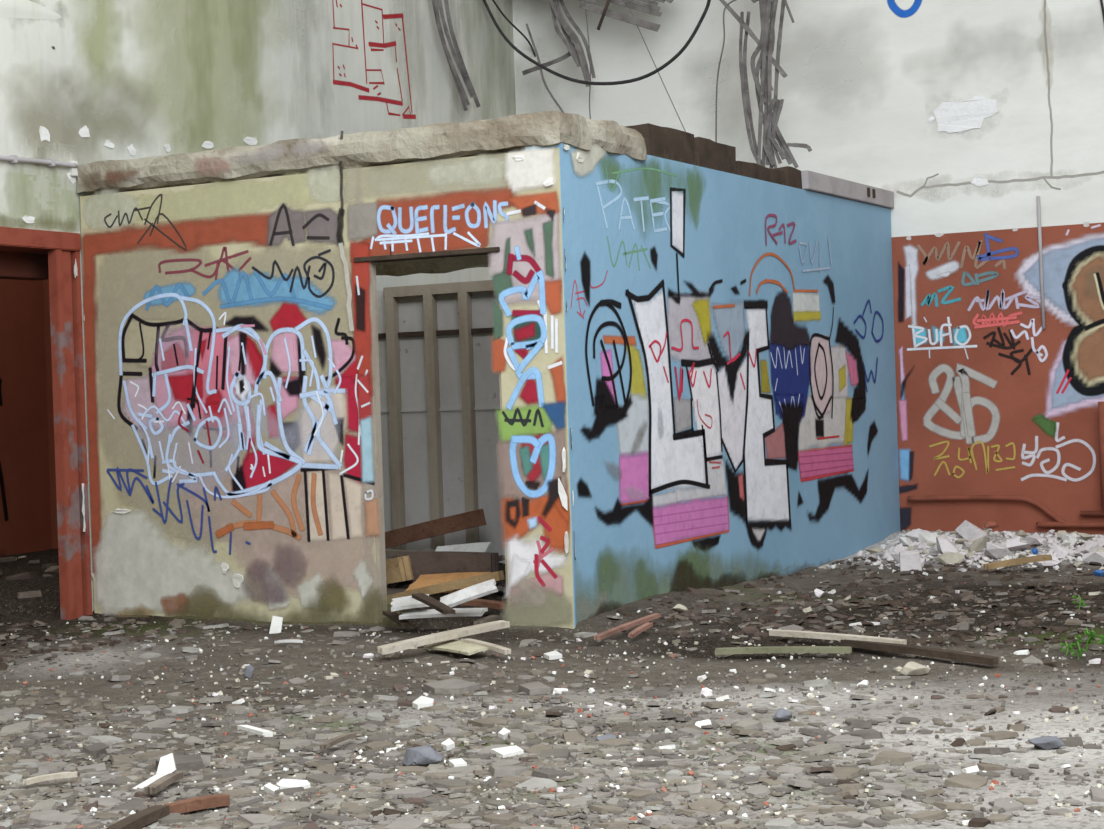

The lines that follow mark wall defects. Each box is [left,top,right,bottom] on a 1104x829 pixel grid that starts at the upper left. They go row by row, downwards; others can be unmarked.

damp [160,0,256,150]
damp [26,108,79,149]
flaking render [928,96,998,134]
damp [83,155,507,228]
damp [95,246,402,628]
peeling [91,508,251,613]
peeling [267,567,325,609]
peeling [354,562,372,598]
damp [670,562,745,592]
damp [594,604,620,617]